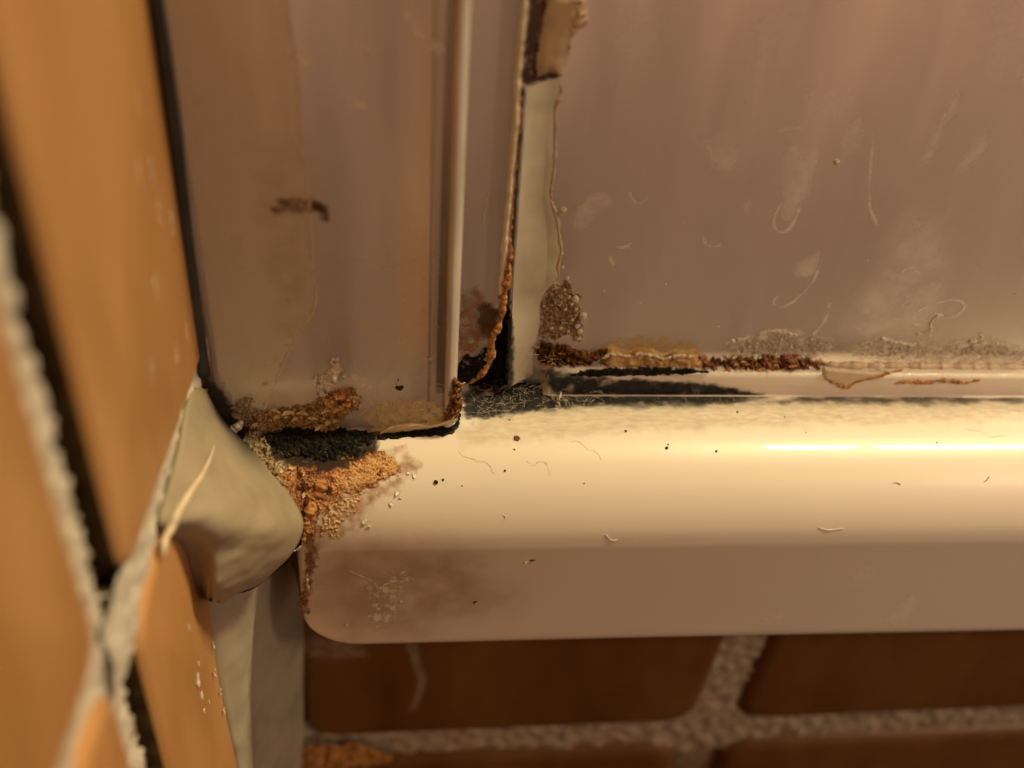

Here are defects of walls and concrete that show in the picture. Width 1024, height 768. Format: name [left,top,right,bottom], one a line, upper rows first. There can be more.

peeling [536,0,578,77]
corrosion [442,0,527,422]
damp [261,301,763,463]
corrosion [533,337,826,372]
corrosion [243,387,413,615]